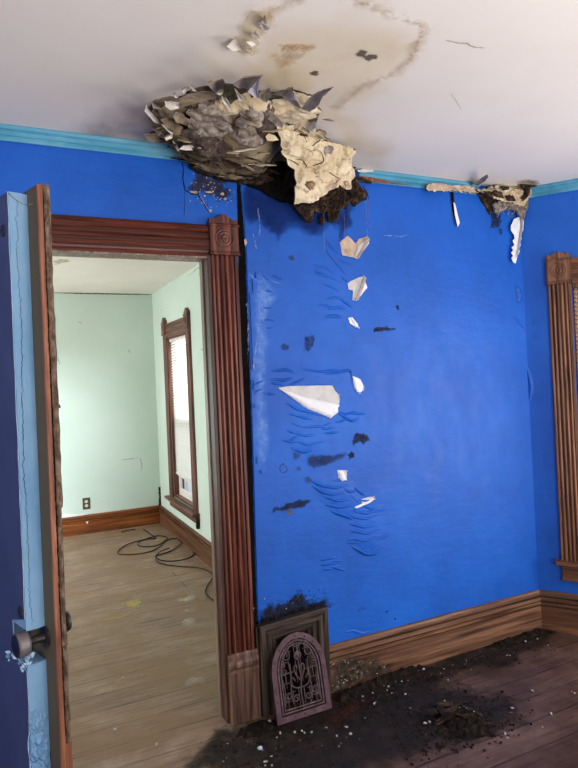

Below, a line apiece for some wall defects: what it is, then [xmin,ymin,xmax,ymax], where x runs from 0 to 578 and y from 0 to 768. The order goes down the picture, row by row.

peeling [227,12,270,56]
leakage [181,0,459,172]
flaking render [144,74,406,225]
flaking render [425,174,537,220]
leakage [309,433,369,466]